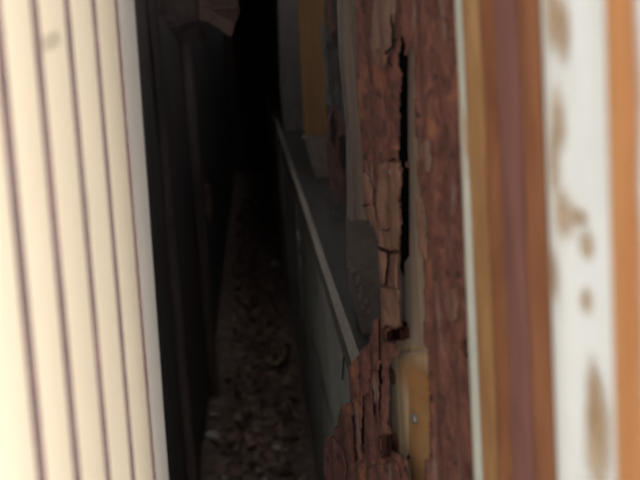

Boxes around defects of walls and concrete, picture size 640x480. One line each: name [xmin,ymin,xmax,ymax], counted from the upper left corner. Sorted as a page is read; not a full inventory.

crack [384,14,398,67]
spalling [397,37,410,274]
crack [378,247,395,286]